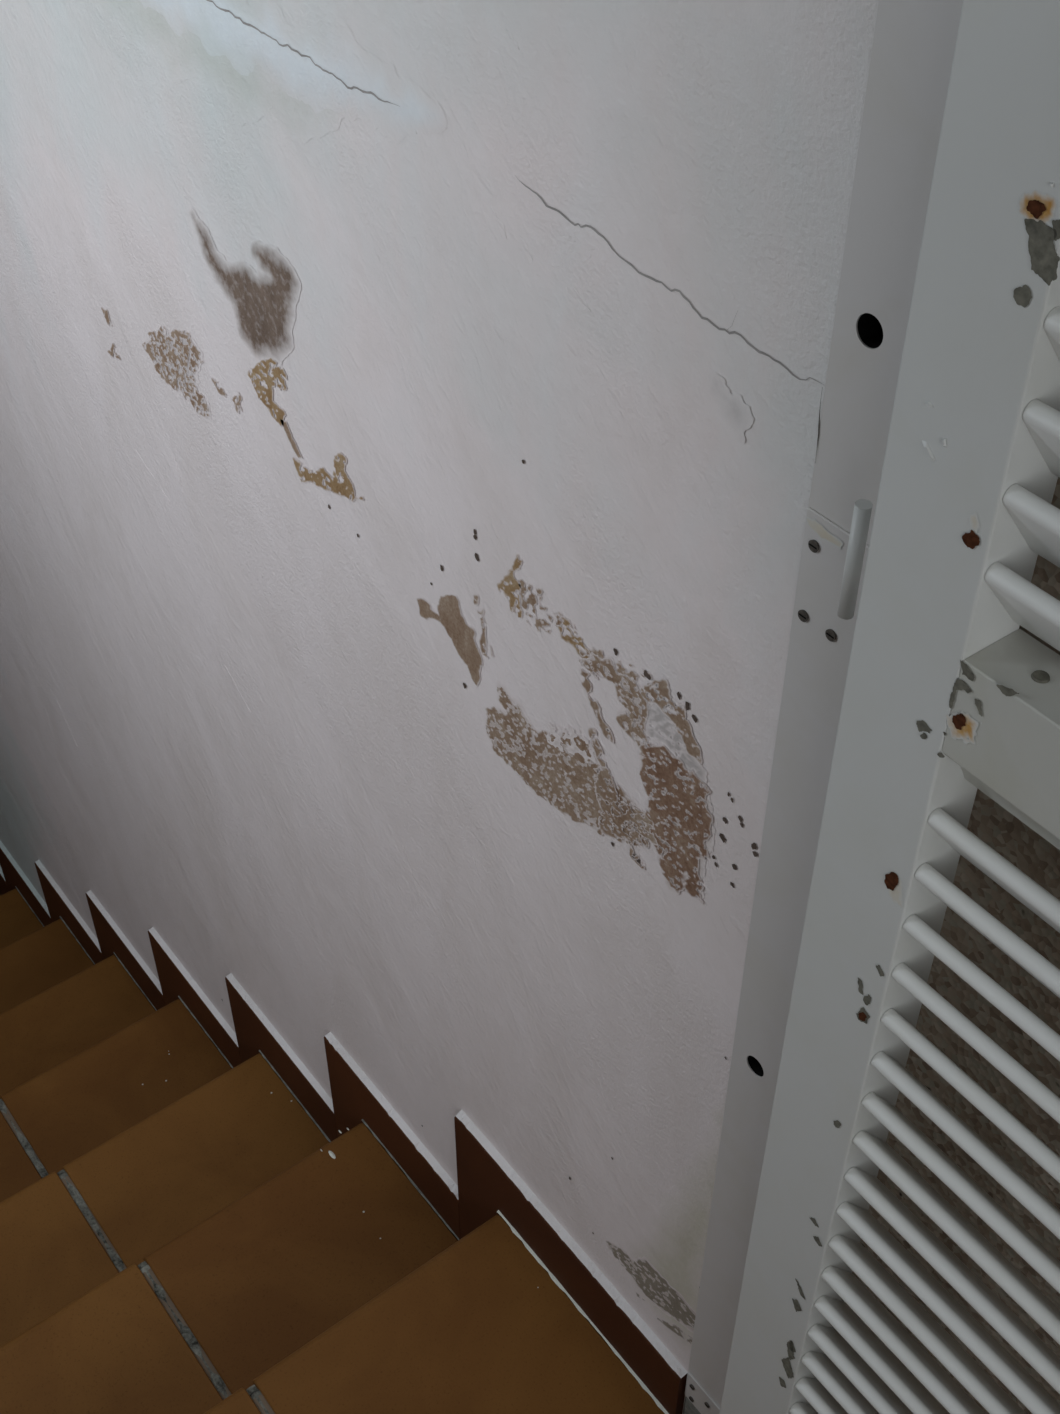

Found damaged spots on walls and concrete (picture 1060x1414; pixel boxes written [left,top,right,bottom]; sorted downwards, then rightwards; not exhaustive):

crack [207,0,400,107]
peeling [101,307,121,360]
leakage [188,208,301,366]
crack [520,181,822,463]
peeling [141,326,364,509]
peeling [416,553,743,904]
peeling [592,1232,696,1345]